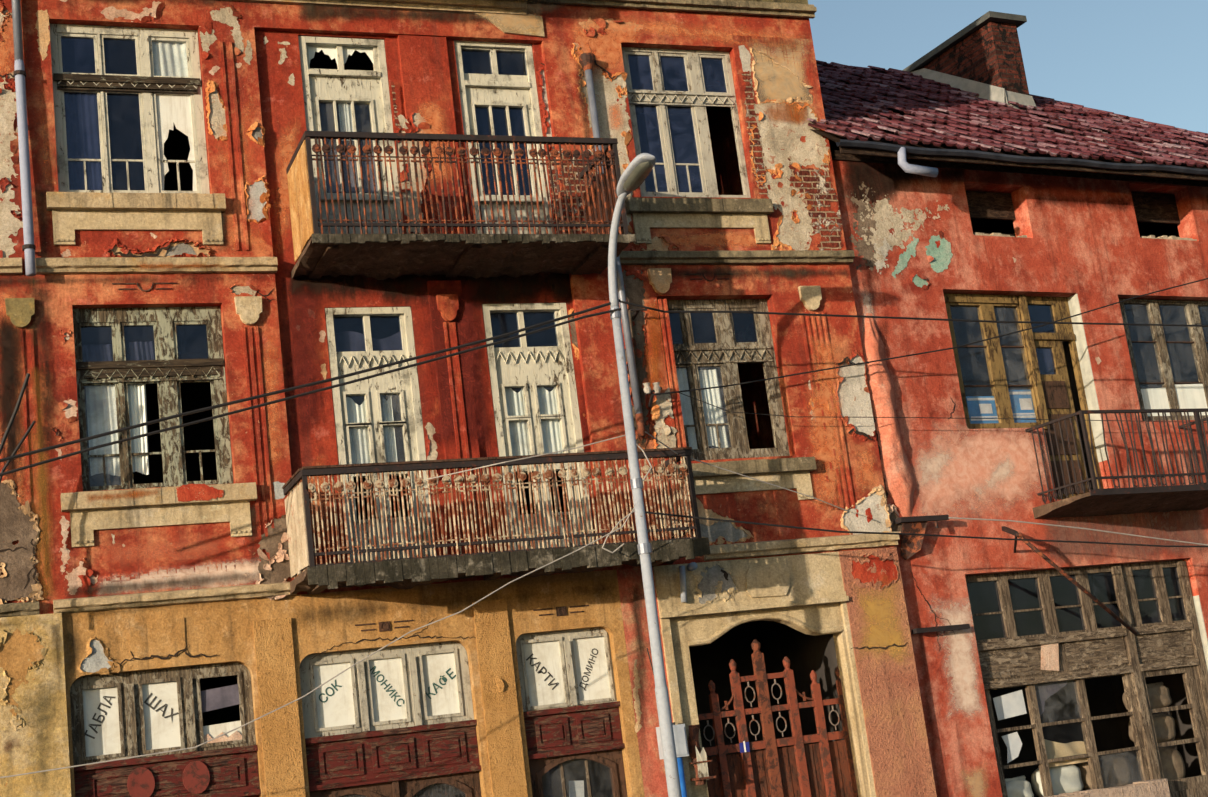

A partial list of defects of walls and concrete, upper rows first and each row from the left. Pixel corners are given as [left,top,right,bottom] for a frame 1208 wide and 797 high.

peeling [0,1,23,258]
peeling [200,5,295,224]
peeling [536,17,953,290]
peeling [0,358,44,604]
water stain [0,289,51,590]
peeling [621,267,677,450]
spalling [808,346,902,535]
peeling [0,628,47,730]
spalling [76,637,120,675]
crack [115,643,217,668]
peeling [692,562,739,604]
peeling [848,551,902,657]